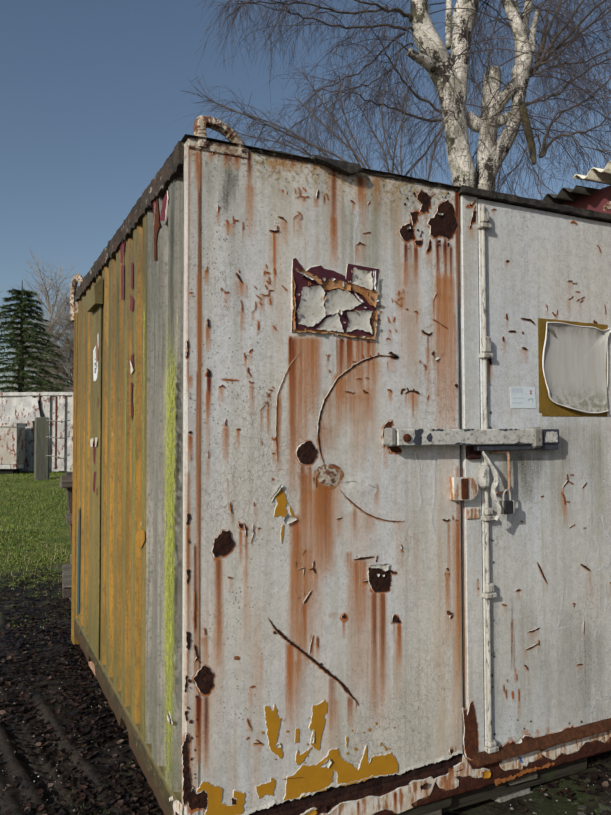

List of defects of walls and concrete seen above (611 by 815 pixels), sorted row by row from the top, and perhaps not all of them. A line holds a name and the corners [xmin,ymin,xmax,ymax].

rust [399,189,477,297]
peeling [290,257,379,341]
rust [289,337,329,603]
leakage [165,380,175,715]
rust [211,522,248,641]
rust [360,561,401,668]
rust [175,664,215,815]
peeling [169,734,246,815]
peeling [254,699,399,801]
rust [240,701,479,815]
peeling [300,754,491,815]
peeling [499,730,611,771]